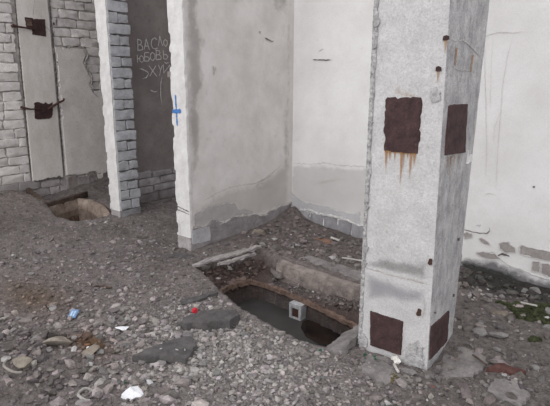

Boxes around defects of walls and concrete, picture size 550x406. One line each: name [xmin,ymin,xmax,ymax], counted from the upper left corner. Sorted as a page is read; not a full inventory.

rust [385,150,416,178]
flaking render [190,202,293,251]
flaking render [457,232,550,281]